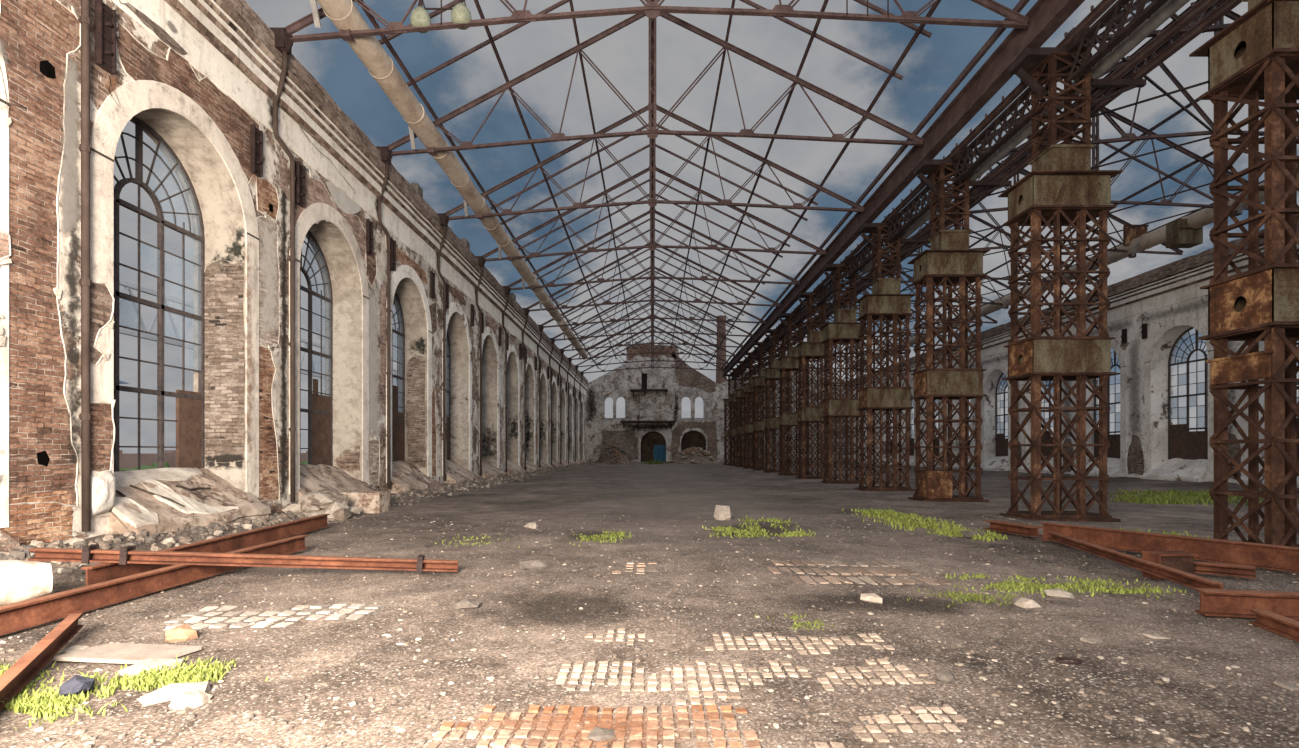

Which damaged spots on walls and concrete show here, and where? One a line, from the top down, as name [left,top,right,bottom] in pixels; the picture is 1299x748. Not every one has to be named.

flaking render [0,0,116,545]
damp [61,60,81,463]
flaking render [116,3,280,502]
flaking render [334,436,380,486]
flaking render [295,171,429,391]